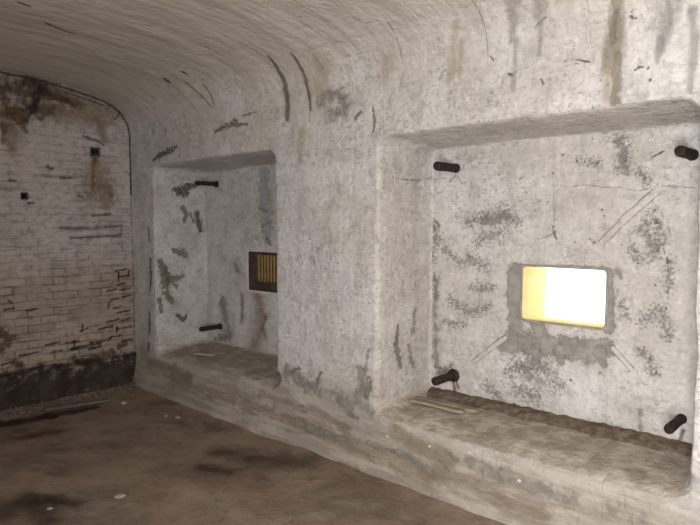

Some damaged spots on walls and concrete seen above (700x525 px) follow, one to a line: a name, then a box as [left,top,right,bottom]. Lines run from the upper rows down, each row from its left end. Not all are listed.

water stain [603,0,624,106]
water stain [0,75,117,150]
peeling [214,112,256,133]
peeling [153,145,178,162]
peeling [172,183,203,232]
peeling [149,258,184,314]
water stain [0,352,136,411]
water stain [336,349,375,420]
water stain [496,351,572,407]
water stain [149,360,549,523]